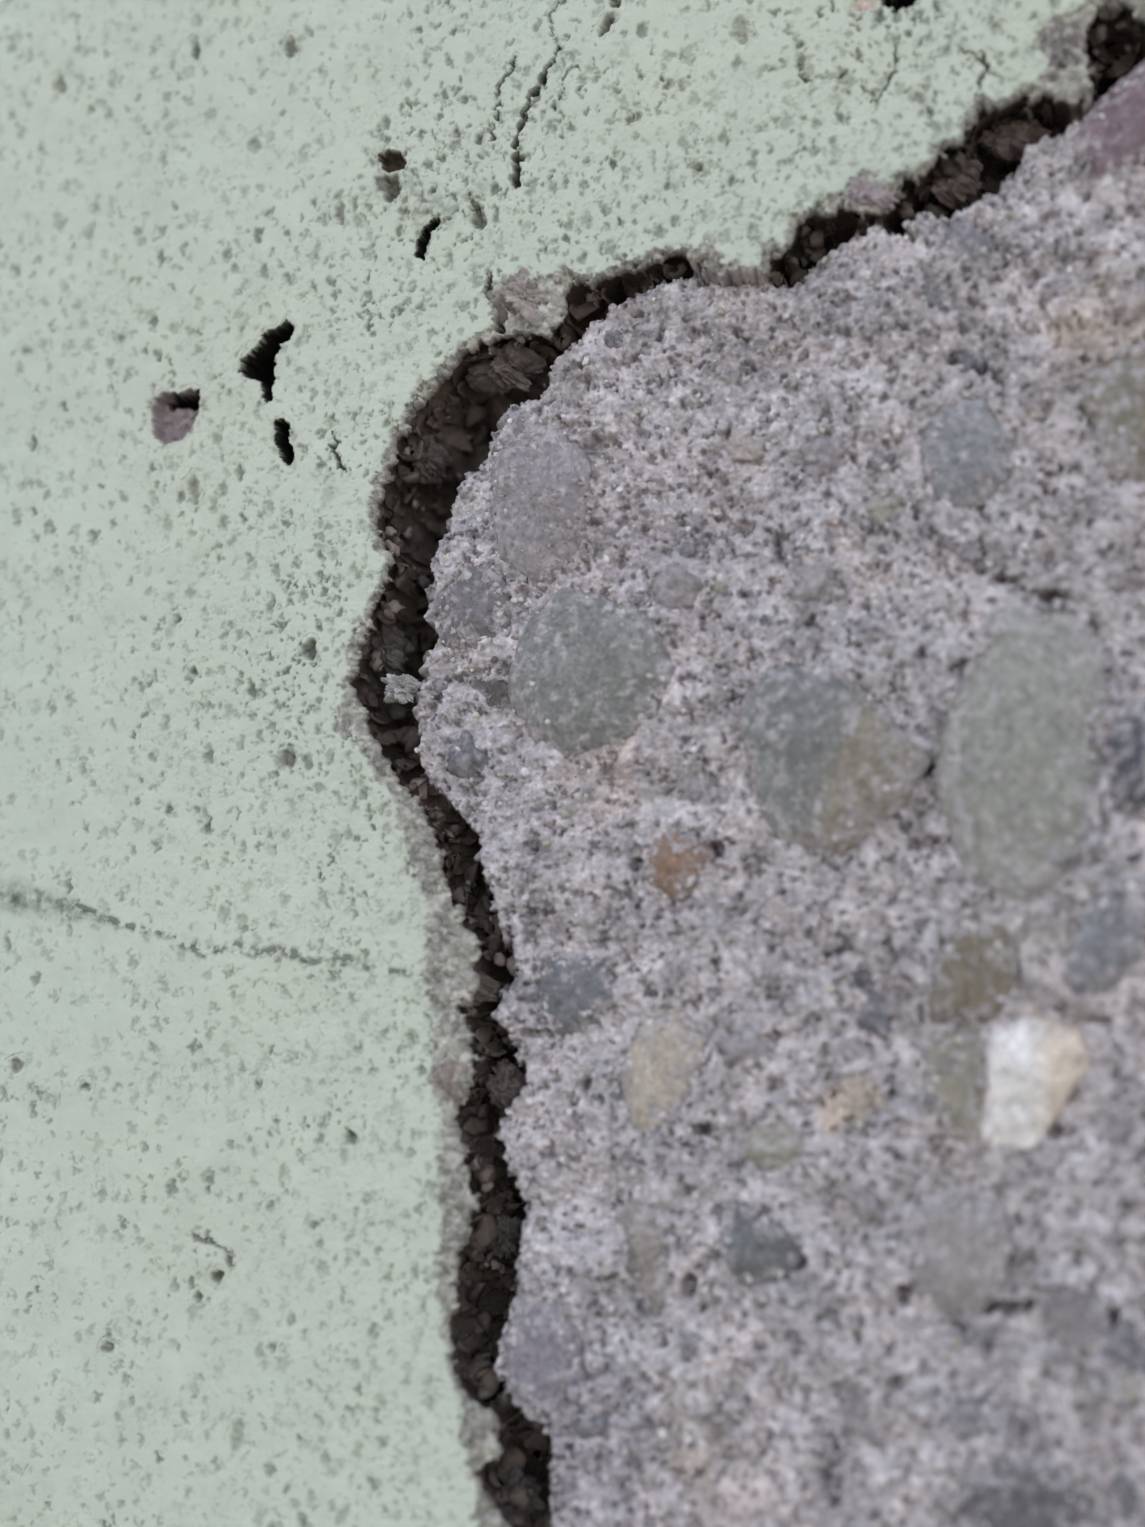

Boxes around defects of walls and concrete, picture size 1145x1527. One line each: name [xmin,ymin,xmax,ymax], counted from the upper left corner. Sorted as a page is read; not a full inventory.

peeling [328,195,351,233]
peeling [297,632,324,666]
crack [329,0,1145,1527]
spalling [333,0,1145,1527]
peeling [304,1216,324,1237]